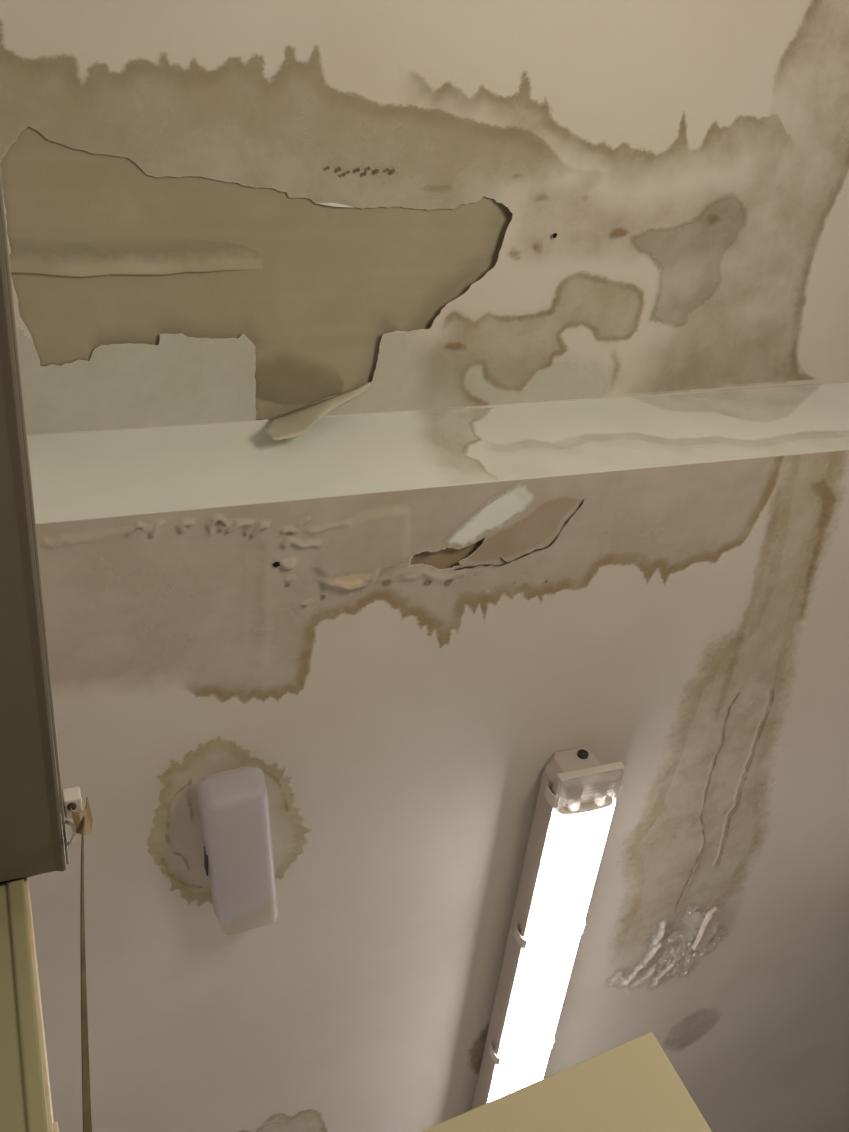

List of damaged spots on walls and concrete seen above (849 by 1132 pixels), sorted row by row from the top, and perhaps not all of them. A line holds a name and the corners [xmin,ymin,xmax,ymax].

leakage [0,24,549,197]
peeling [0,127,513,441]
peeling [411,485,534,569]
flaking render [606,905,727,991]